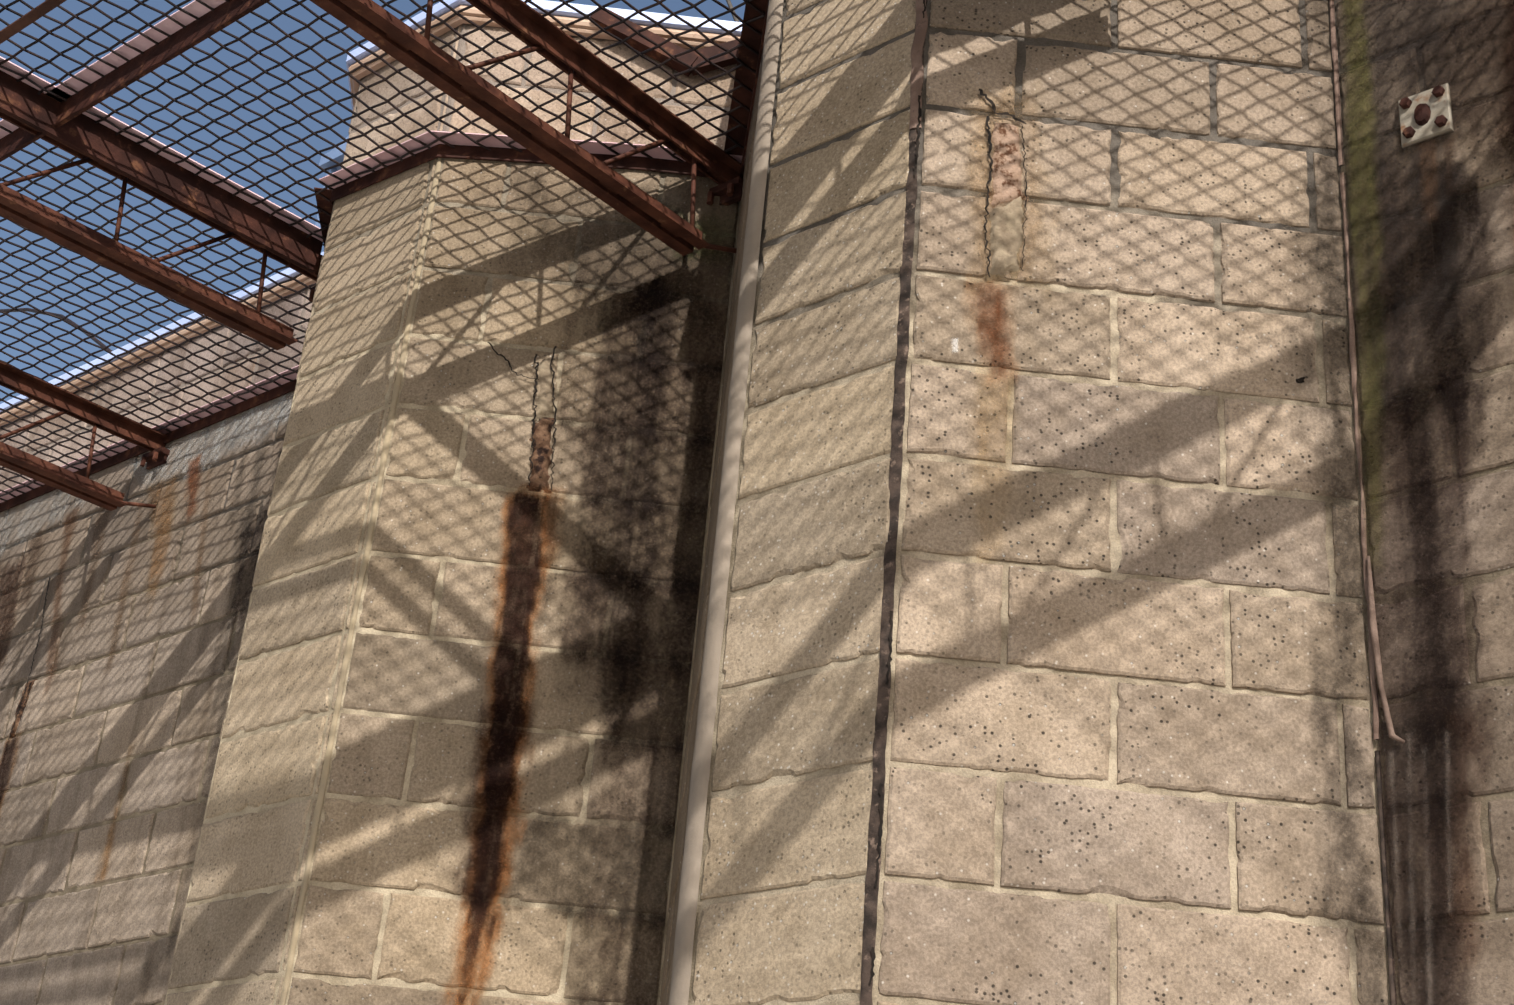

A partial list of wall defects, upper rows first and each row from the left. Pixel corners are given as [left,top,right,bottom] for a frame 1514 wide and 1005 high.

spalling [984,123,1028,282]
crack [487,342,557,490]
corrosion [458,491,545,1005]